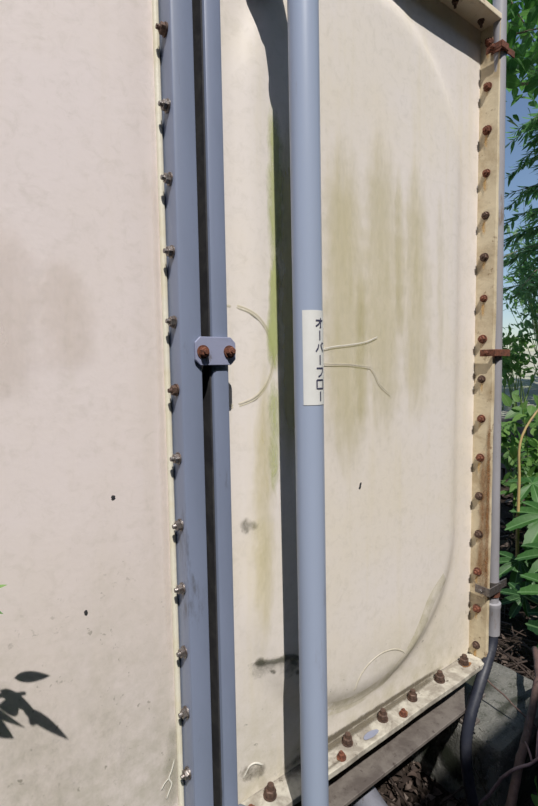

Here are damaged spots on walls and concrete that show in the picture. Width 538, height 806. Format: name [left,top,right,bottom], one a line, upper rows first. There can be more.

damp [268,123,294,424]
corrosion [478,429,491,587]
damp [257,655,299,673]